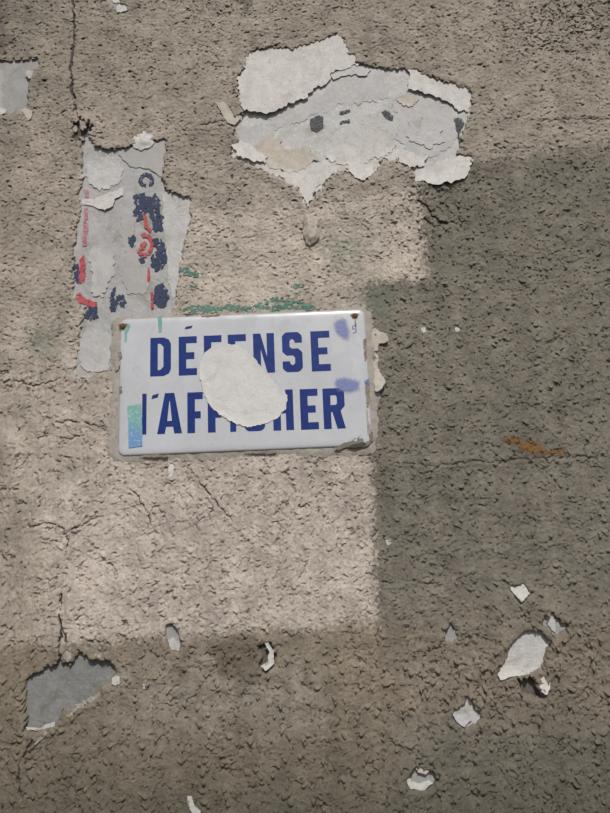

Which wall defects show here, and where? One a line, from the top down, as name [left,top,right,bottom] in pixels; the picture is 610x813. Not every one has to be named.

peeling [0,58,39,121]
crack [69,0,78,116]
peeling [216,33,474,206]
peeling [371,328,388,392]
corrosion [503,435,564,456]
peeling [509,583,532,602]
crack [58,593,67,657]
peeling [497,612,567,696]
spalling [26,651,120,745]
spalling [452,697,481,728]
crack [16,741,38,797]
spalling [406,767,437,791]